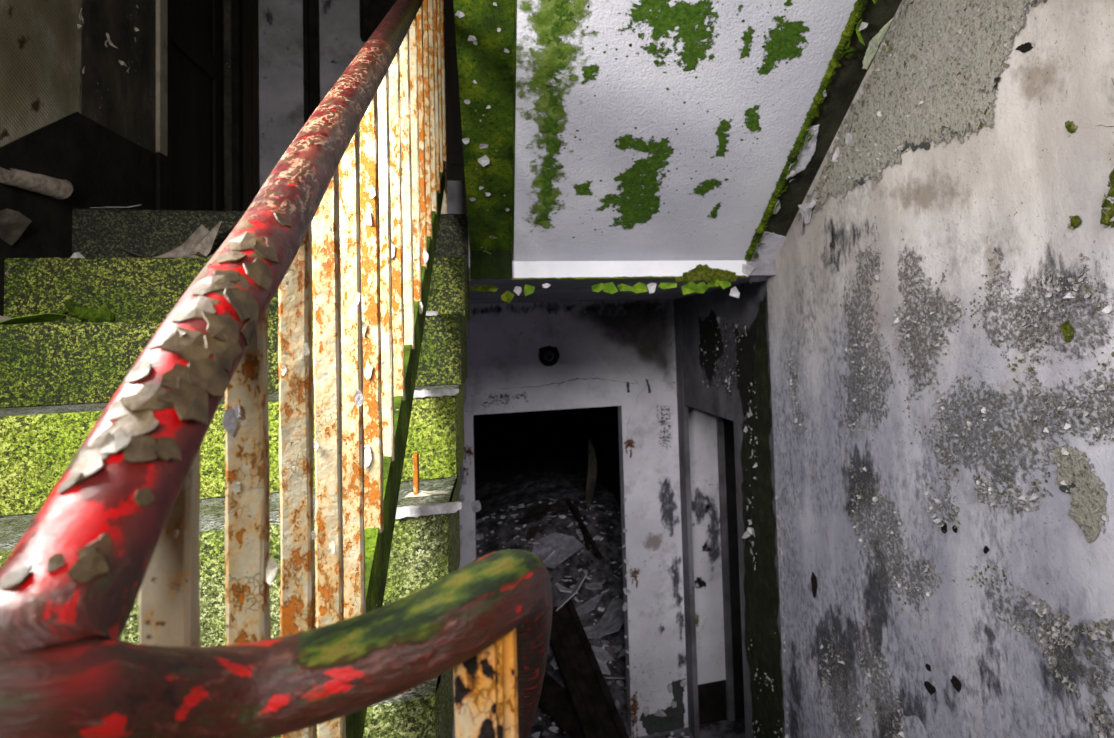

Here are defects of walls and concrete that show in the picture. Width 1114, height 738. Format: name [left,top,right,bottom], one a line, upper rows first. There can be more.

flaking render [798,0,1047,235]
peeling [274,212,291,228]
peeling [57,232,280,494]
leakage [659,479,679,535]
leakage [691,488,721,564]
peeling [699,317,758,479]
leakage [842,445,880,520]
peeling [839,216,1114,738]
leakage [788,538,894,738]
leakage [872,689,955,738]